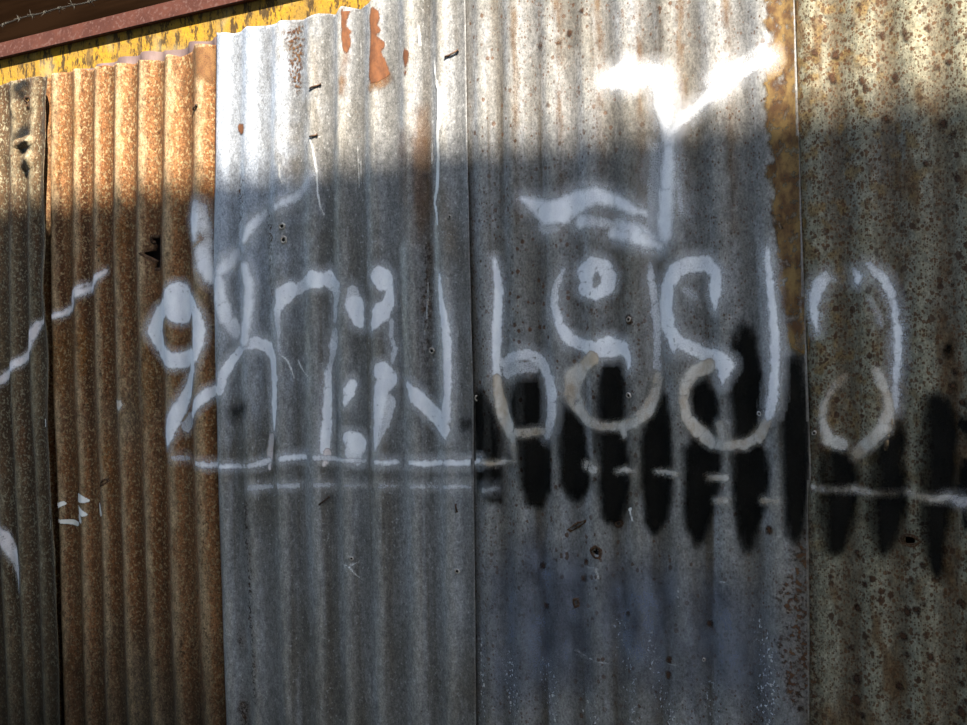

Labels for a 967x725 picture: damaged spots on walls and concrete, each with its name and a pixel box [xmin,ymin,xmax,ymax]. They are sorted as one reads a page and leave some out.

corrosion [341,9,351,54]
corrosion [369,7,390,91]
corrosion [763,0,811,355]
corrosion [776,522,820,725]